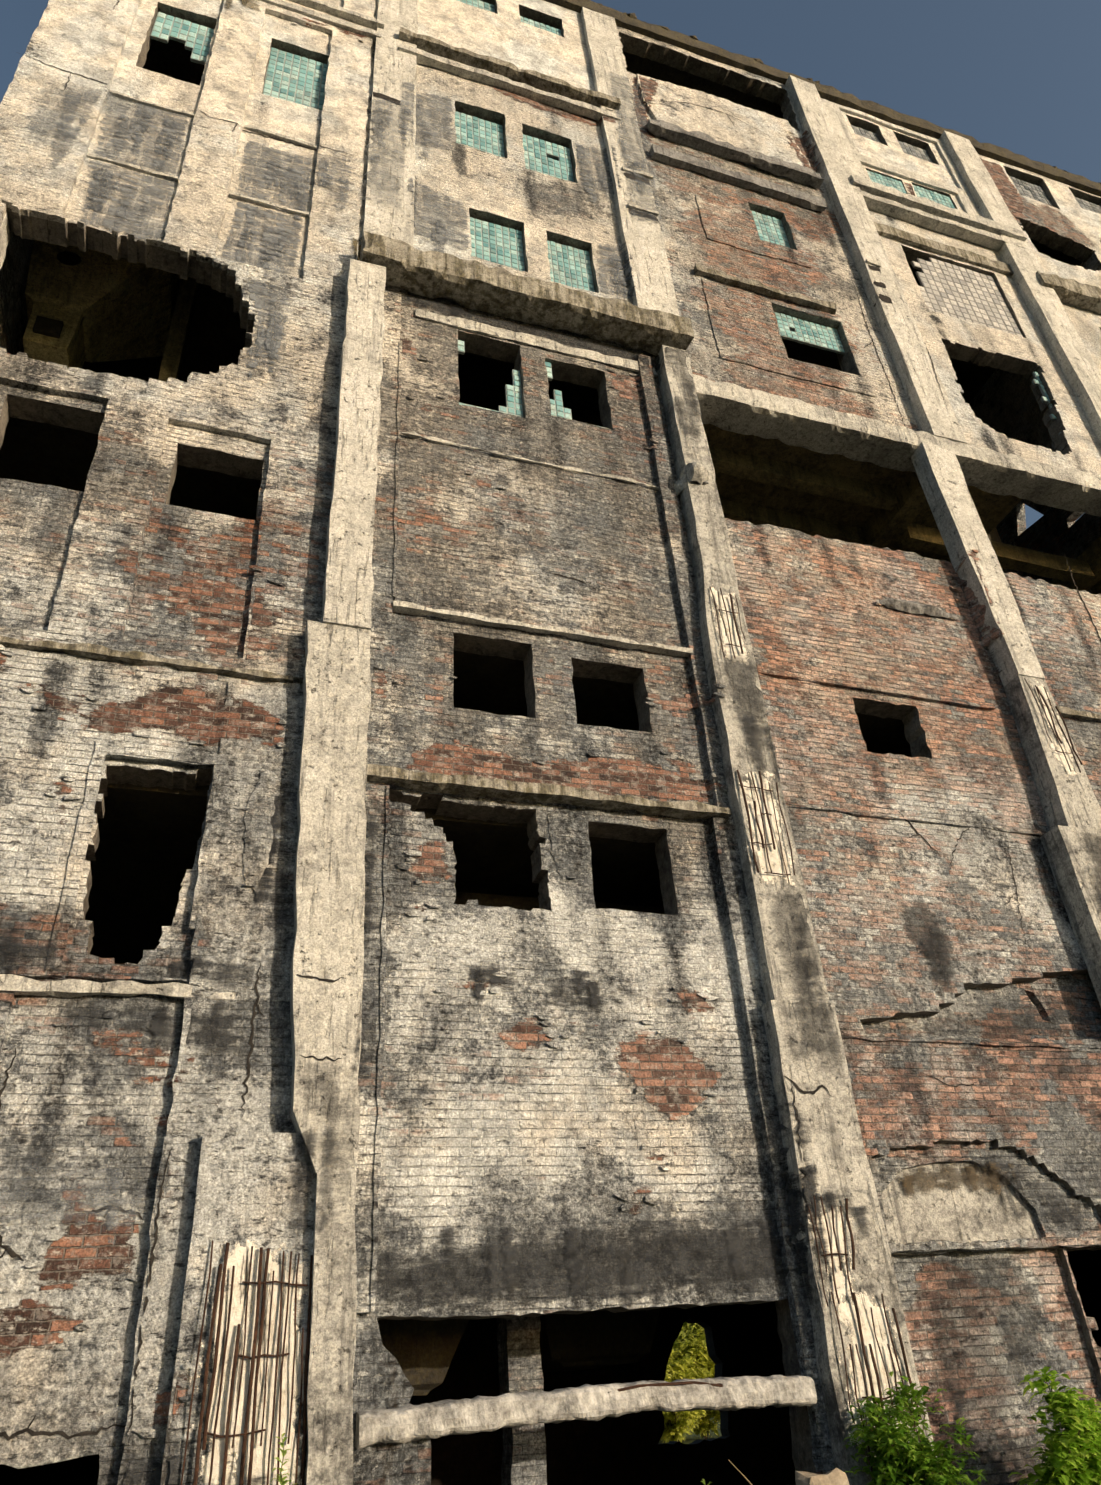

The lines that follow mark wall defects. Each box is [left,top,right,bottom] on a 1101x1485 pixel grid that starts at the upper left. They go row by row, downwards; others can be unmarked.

flaking render [147,565,289,661]
spalling [708,584,750,665]
crack [1065,557,1101,642]
flaking render [20,684,287,748]
flaking render [404,739,797,887]
water stain [2,937,21,975]
crack [0,1048,16,1108]
crack [241,960,346,1116]
flaking render [499,1011,722,1120]
flaking render [0,1174,147,1362]
water stain [444,1226,458,1259]
spalling [792,1195,922,1476]